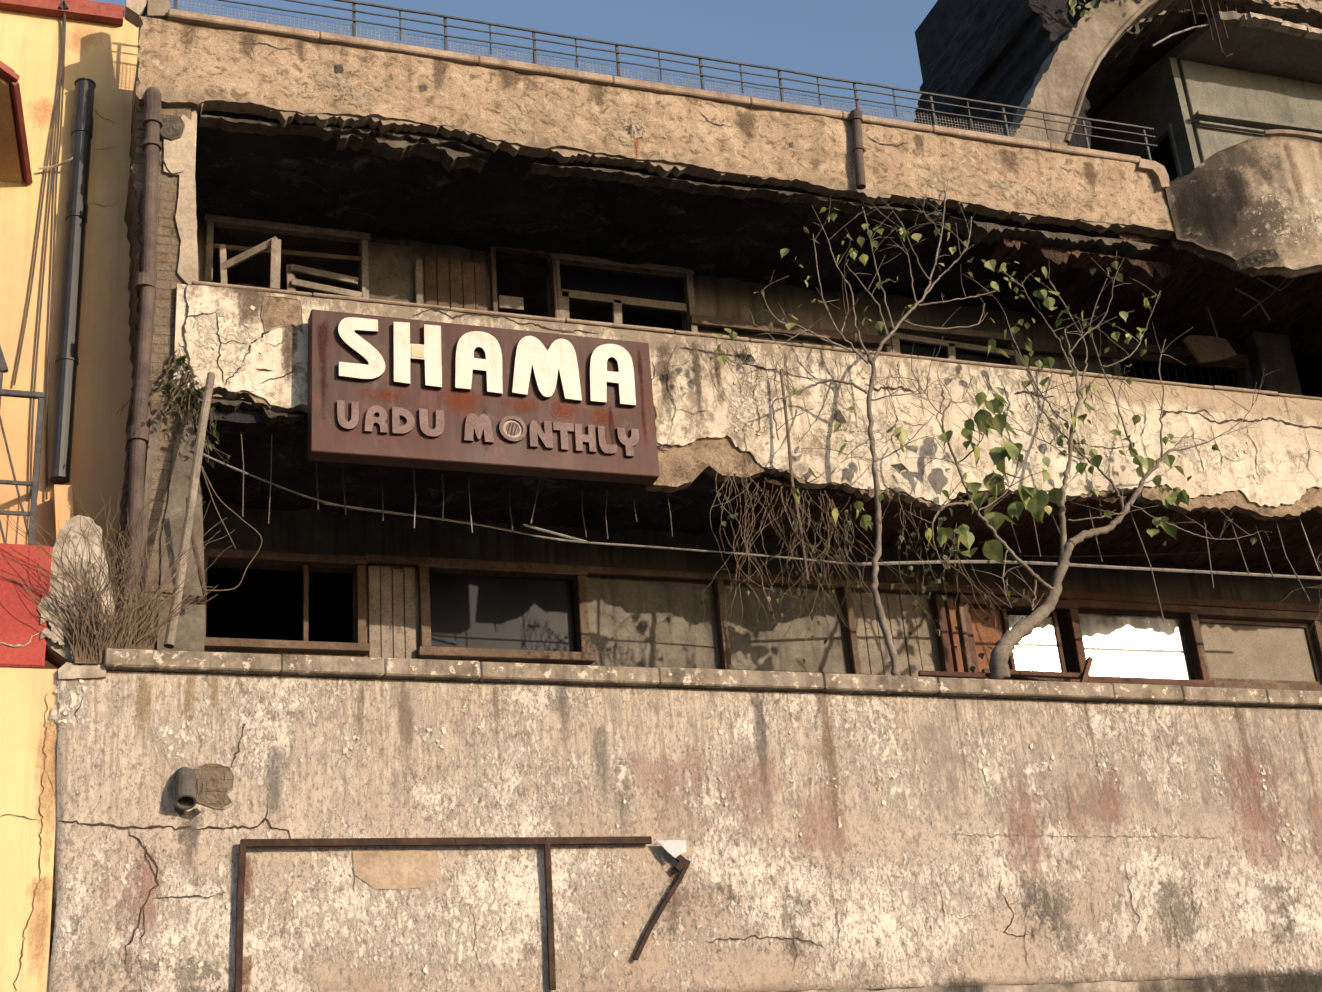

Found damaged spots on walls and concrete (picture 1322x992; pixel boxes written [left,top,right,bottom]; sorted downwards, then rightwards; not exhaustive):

spalling [1152,0,1322,57]
crack [182,285,303,387]
flaking render [633,354,1024,554]
peeling [1011,397,1131,472]
crack [1063,401,1322,479]
flaking render [1046,434,1322,623]
flaking render [143,718,235,820]
crack [0,694,291,992]
flaking render [254,849,541,988]
rust [243,958,251,992]